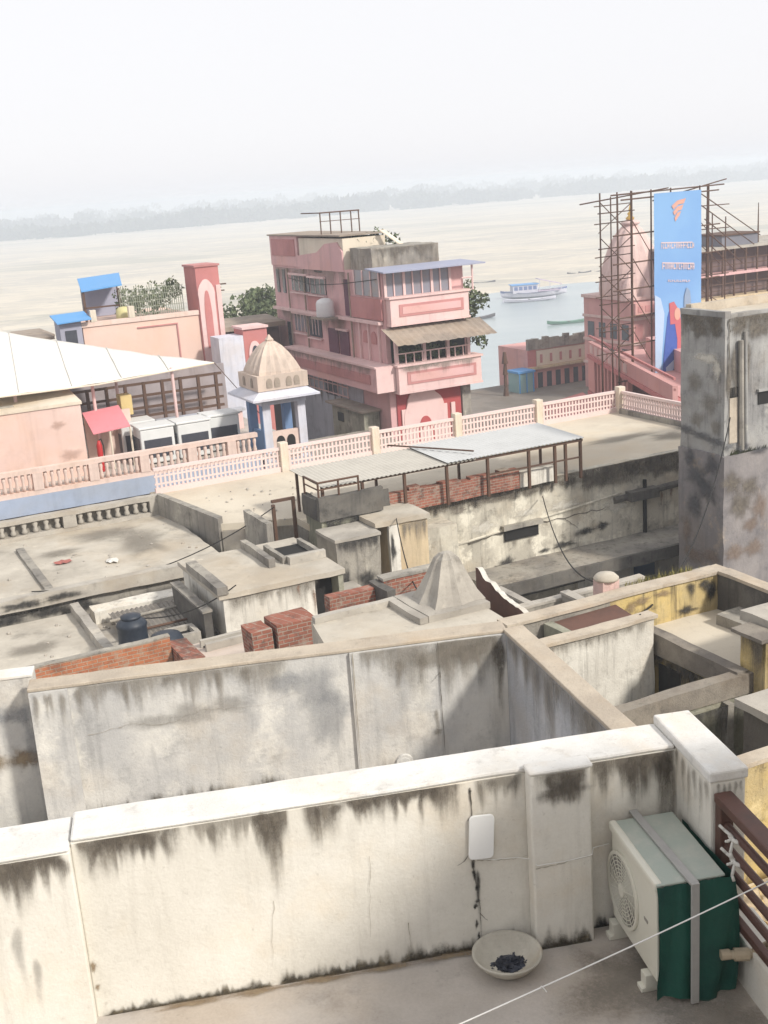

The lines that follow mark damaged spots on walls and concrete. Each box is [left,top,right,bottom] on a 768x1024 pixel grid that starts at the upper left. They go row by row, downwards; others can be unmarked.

leakage [682,313,768,391]
leakage [659,398,766,453]
leakage [679,580,716,613]
leakage [35,661,281,708]
leakage [305,774,519,835]
leakage [545,750,741,812]
leakage [77,828,176,865]
leakage [194,811,287,863]
leakage [0,855,67,898]
crack [459,856,589,937]
leakage [107,862,480,1016]